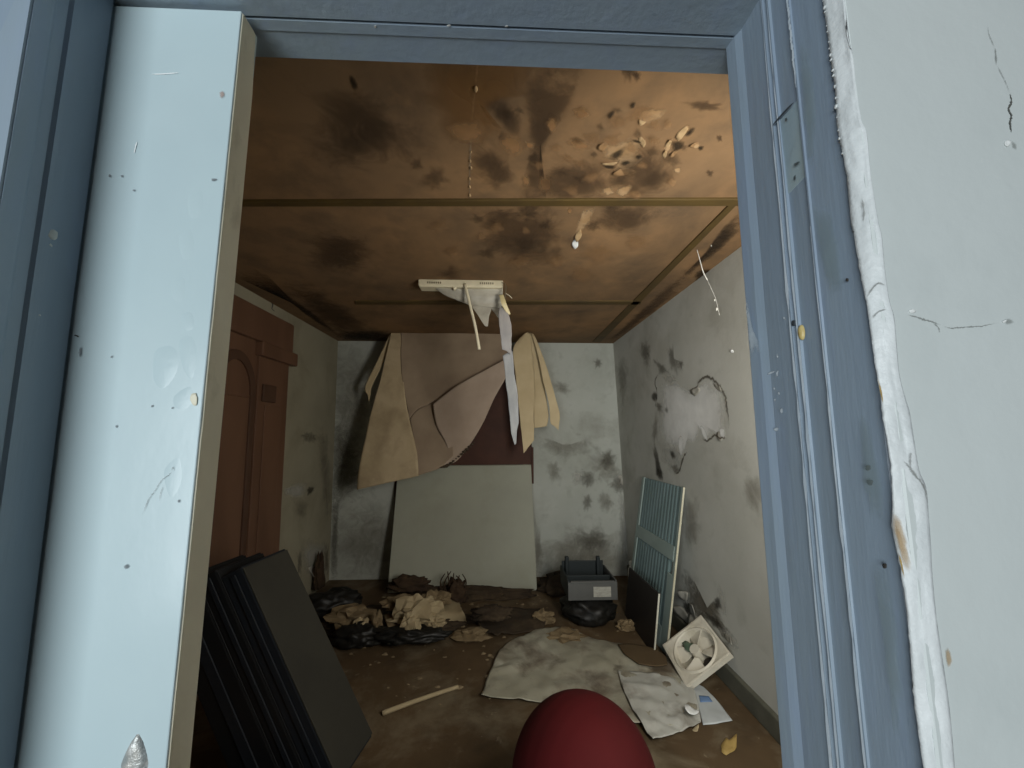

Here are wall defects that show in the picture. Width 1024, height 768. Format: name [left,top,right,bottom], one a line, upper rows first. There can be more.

damp [445,72,512,141]
crack [988,30,1013,147]
damp [532,109,556,170]
peeling [570,103,665,196]
peeling [662,126,703,173]
damp [694,224,733,278]
damp [256,284,386,340]
crack [909,309,1007,331]
peeling [655,375,729,474]